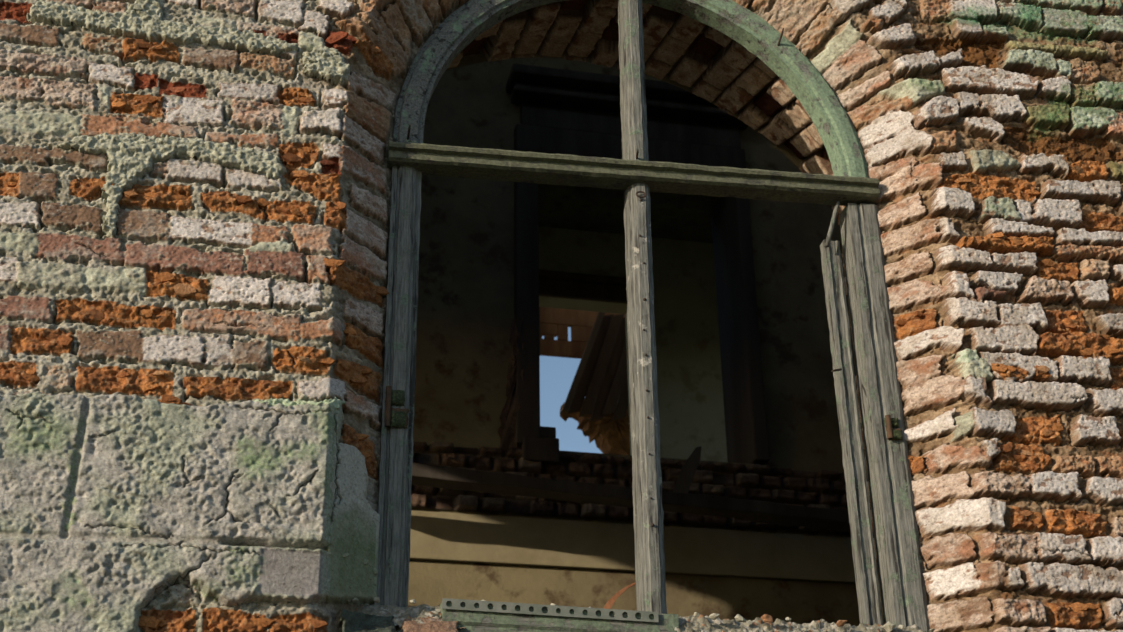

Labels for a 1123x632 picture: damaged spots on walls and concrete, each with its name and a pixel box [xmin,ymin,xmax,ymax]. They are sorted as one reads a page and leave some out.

crack [237,405,341,520]
crack [87,470,260,605]